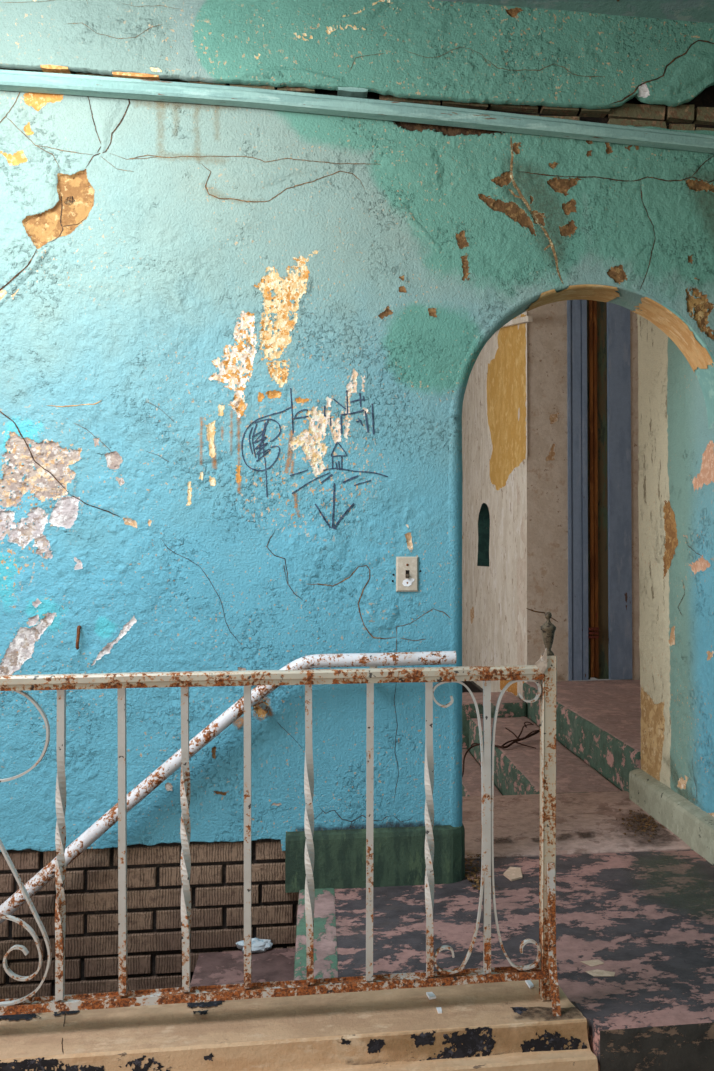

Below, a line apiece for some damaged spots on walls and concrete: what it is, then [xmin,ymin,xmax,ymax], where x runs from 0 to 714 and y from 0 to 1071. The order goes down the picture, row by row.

crack [0,92,381,202]
crack [350,47,603,77]
flaking render [365,82,714,131]
crack [611,40,714,104]
crack [0,195,87,290]
flaking render [21,168,95,250]
crack [509,138,714,291]
peeling [205,250,318,458]
peeling [486,264,628,493]
crack [0,411,120,517]
peeling [0,431,125,560]
peeling [411,1027,496,1061]